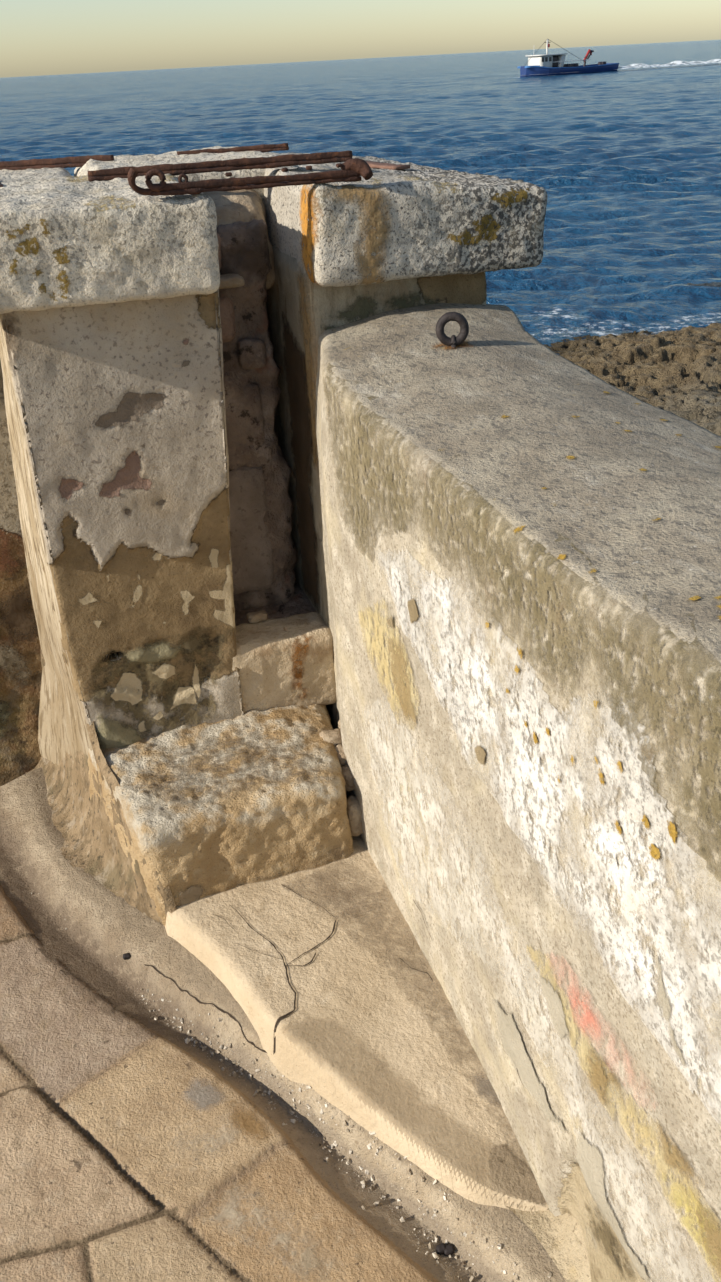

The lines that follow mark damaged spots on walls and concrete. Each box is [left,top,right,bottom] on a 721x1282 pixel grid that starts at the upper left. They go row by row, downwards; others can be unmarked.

rust [332,185,389,285]
peeling [95,392,165,428]
peeling [99,451,165,516]
peeling [0,478,240,786]
crack [144,884,336,1055]